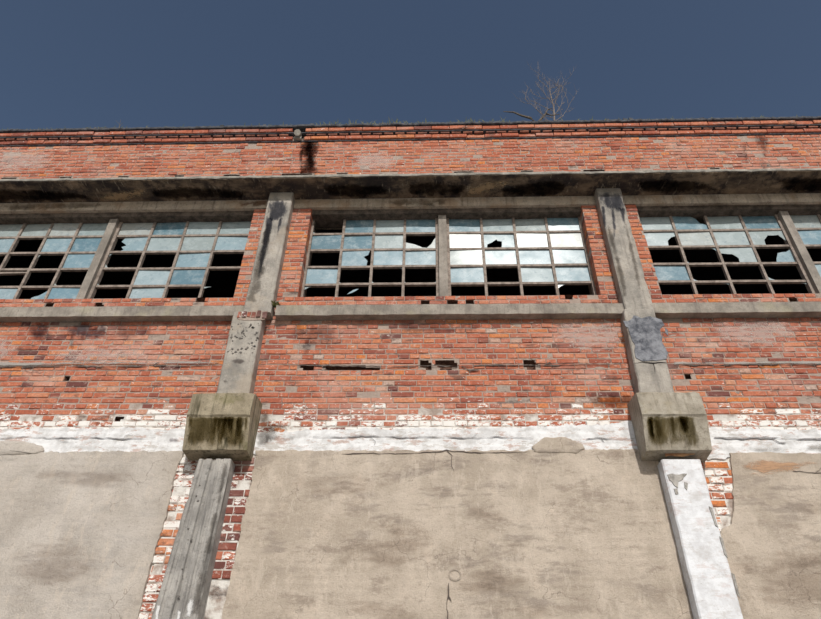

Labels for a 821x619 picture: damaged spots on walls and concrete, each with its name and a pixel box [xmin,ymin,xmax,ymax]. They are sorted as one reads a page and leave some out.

leakage [300,140,317,173]
leakage [260,218,281,269]
crack [334,433,523,470]
crack [714,435,821,443]
peeling [667,473,688,494]
flaking render [138,457,201,619]
flaking render [212,457,256,580]
flaking render [701,462,733,558]